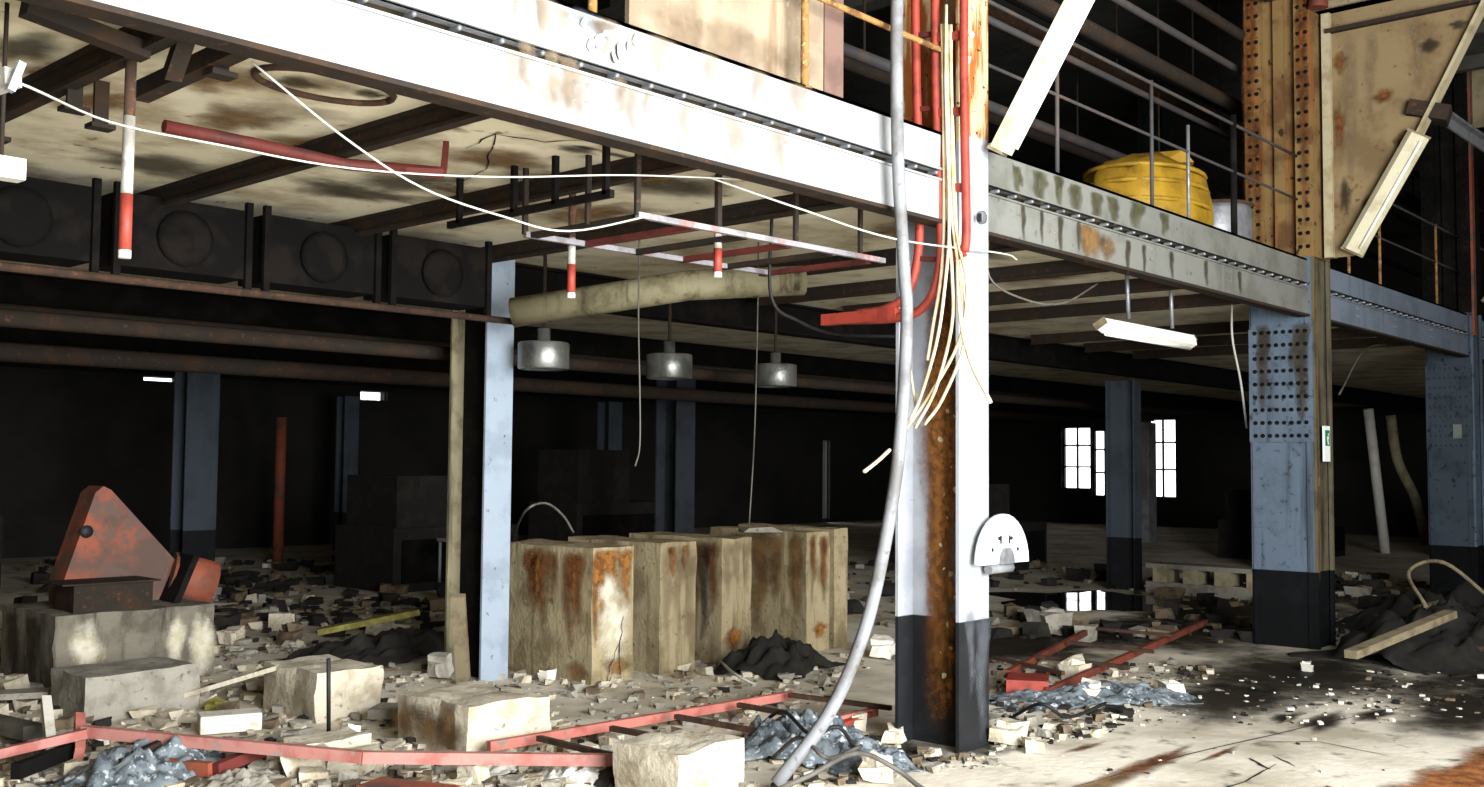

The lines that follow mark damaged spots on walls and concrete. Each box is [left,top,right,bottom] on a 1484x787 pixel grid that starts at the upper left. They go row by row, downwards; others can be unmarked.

corrosion [1243,0,1262,230]
leakage [310,176,477,202]
leakage [460,151,551,180]
leakage [627,177,715,195]
leakage [1014,167,1169,250]
leakage [1126,241,1146,272]
corrosion [923,279,956,698]
corrosion [524,550,633,632]
corrosion [669,542,718,623]
corrosion [732,534,828,609]
leakage [989,578,1484,732]
corrosion [1406,747,1484,787]